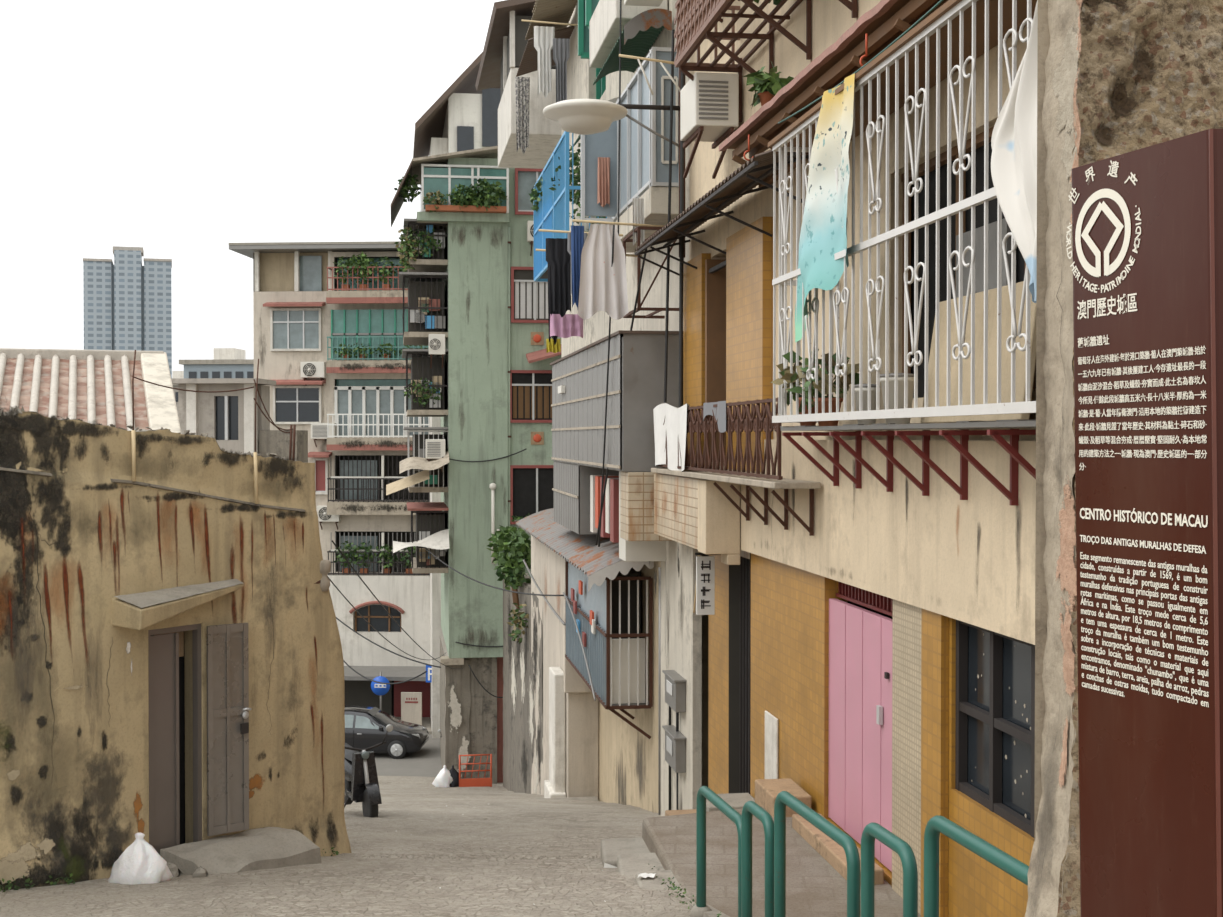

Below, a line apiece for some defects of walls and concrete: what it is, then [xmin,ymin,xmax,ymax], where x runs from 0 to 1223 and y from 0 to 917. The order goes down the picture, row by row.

damp [0,408,118,702]
rust [44,561,87,657]
rust [98,490,129,587]
rust [175,506,211,582]
rust [230,514,276,624]
damp [5,735,16,757]
peeling [447,685,471,778]
damp [11,786,23,804]
damp [0,798,122,891]